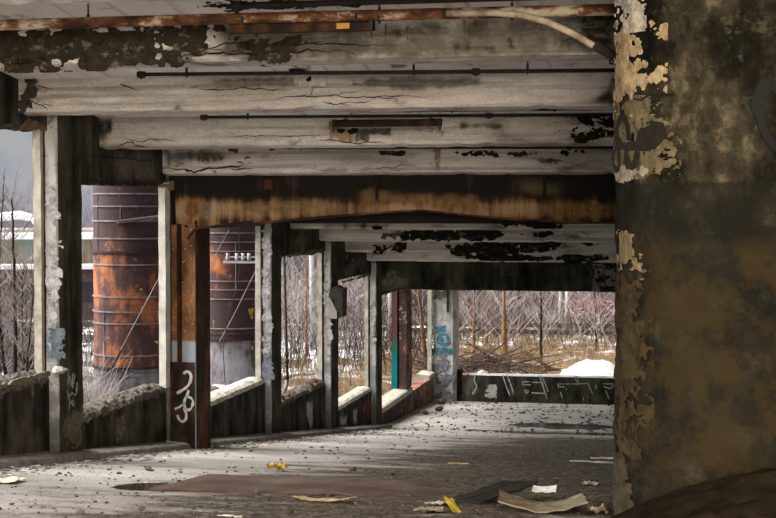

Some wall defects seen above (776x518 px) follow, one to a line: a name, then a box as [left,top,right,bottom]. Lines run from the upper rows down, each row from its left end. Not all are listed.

peeling [613,0,668,41]
peeling [0,25,226,131]
peeling [234,34,311,82]
crack [191,86,426,106]
peeling [560,95,682,183]
corrosion [362,191,478,209]
peeling [45,191,66,359]
spalling [0,371,51,390]
peeling [372,224,655,516]